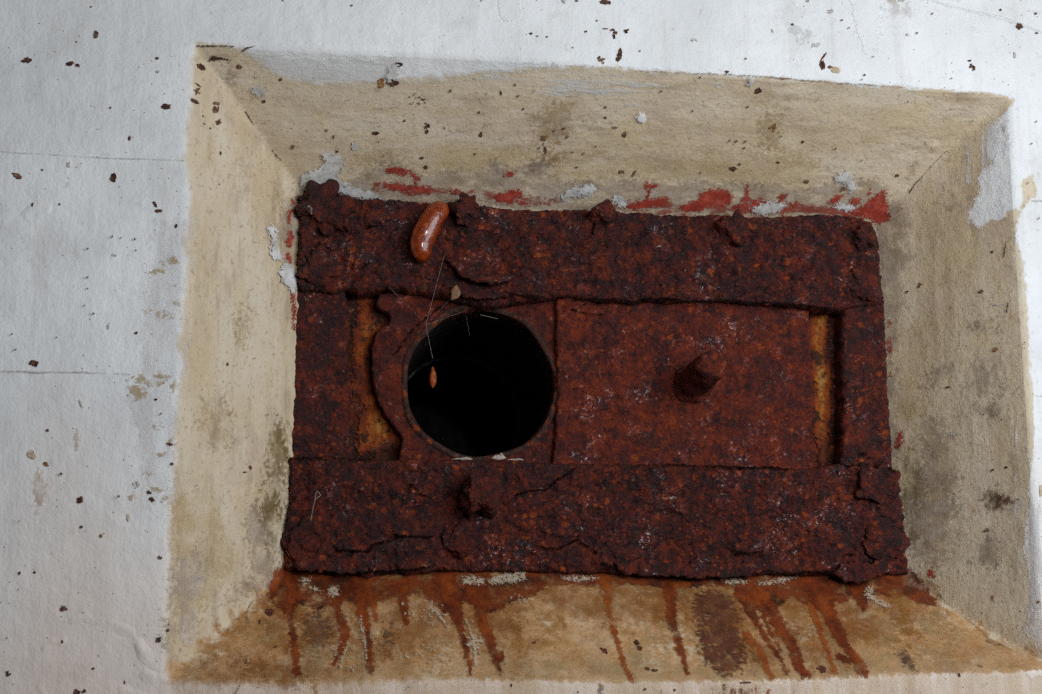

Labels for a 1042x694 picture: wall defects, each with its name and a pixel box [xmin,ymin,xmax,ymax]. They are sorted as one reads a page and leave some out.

peeling [267,135,923,353]
mould [259,496,285,546]
mould [264,414,289,484]
corrosion [348,296,401,456]
corrosion [809,314,835,467]
peeling [889,409,905,455]
mould [981,489,1019,511]
corrosion [265,562,937,694]